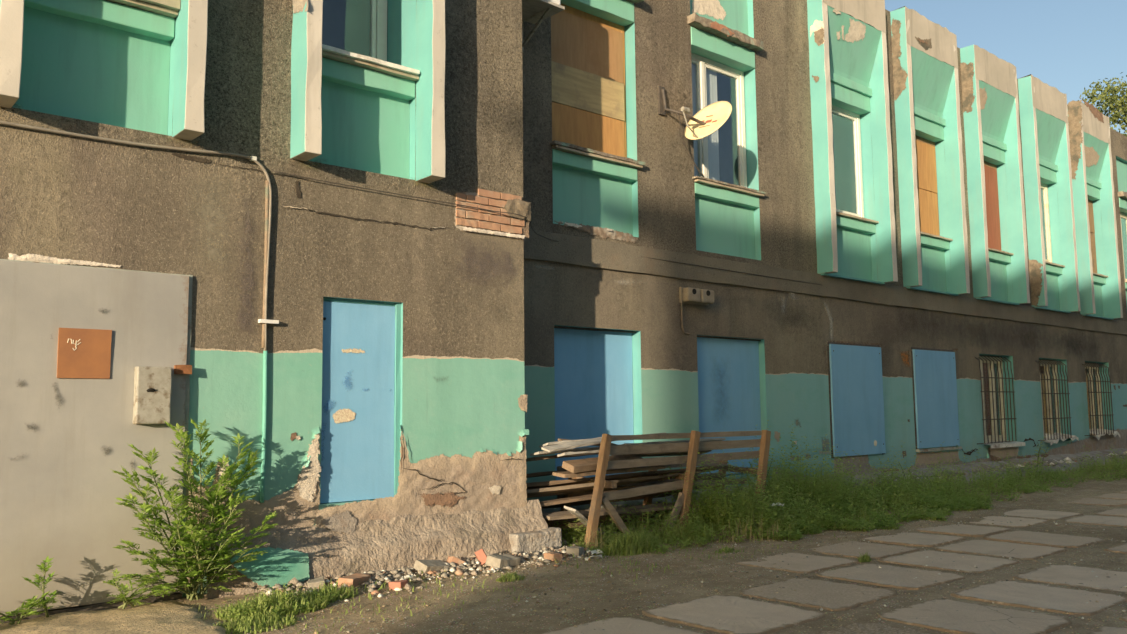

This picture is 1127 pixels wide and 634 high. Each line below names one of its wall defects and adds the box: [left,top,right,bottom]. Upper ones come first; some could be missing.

peeling [691,0,734,37]
peeling [810,7,866,46]
peeling [891,18,908,100]
flaking render [915,37,932,50]
peeling [960,62,987,113]
crack [281,206,449,230]
flaking render [454,189,531,240]
spalling [554,220,638,243]
peeling [325,401,356,424]
peeling [183,424,529,593]